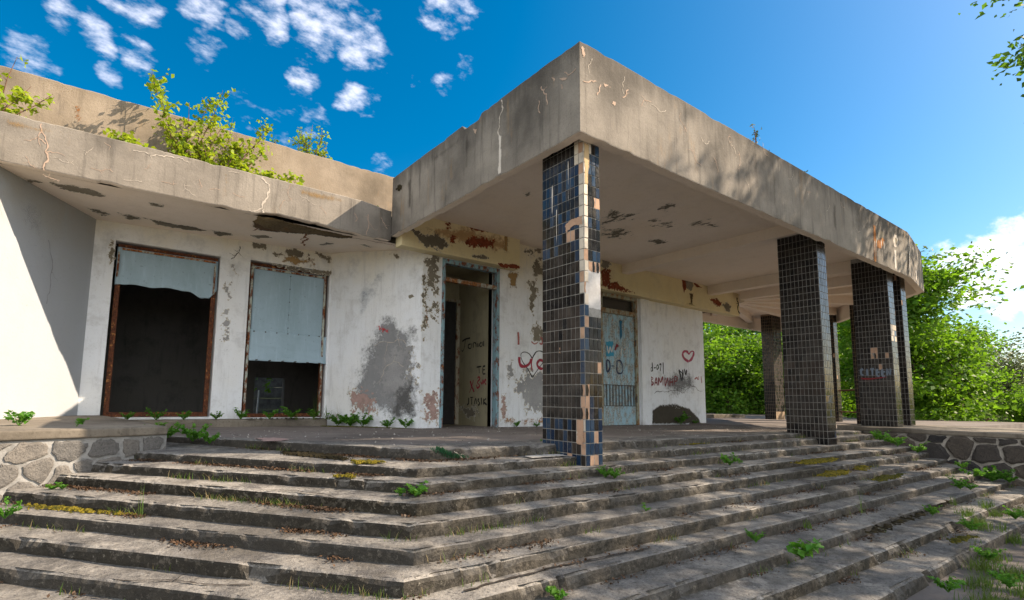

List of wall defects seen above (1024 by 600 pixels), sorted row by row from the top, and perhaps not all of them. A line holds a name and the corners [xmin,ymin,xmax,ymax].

crack [26,124,237,196]
peeling [25,178,233,236]
peeling [565,216,582,232]
peeling [600,203,676,244]
peeling [343,222,495,426]
spalling [682,280,702,293]
peeling [702,298,731,313]
peeling [500,360,543,422]
peeling [576,419,584,446]